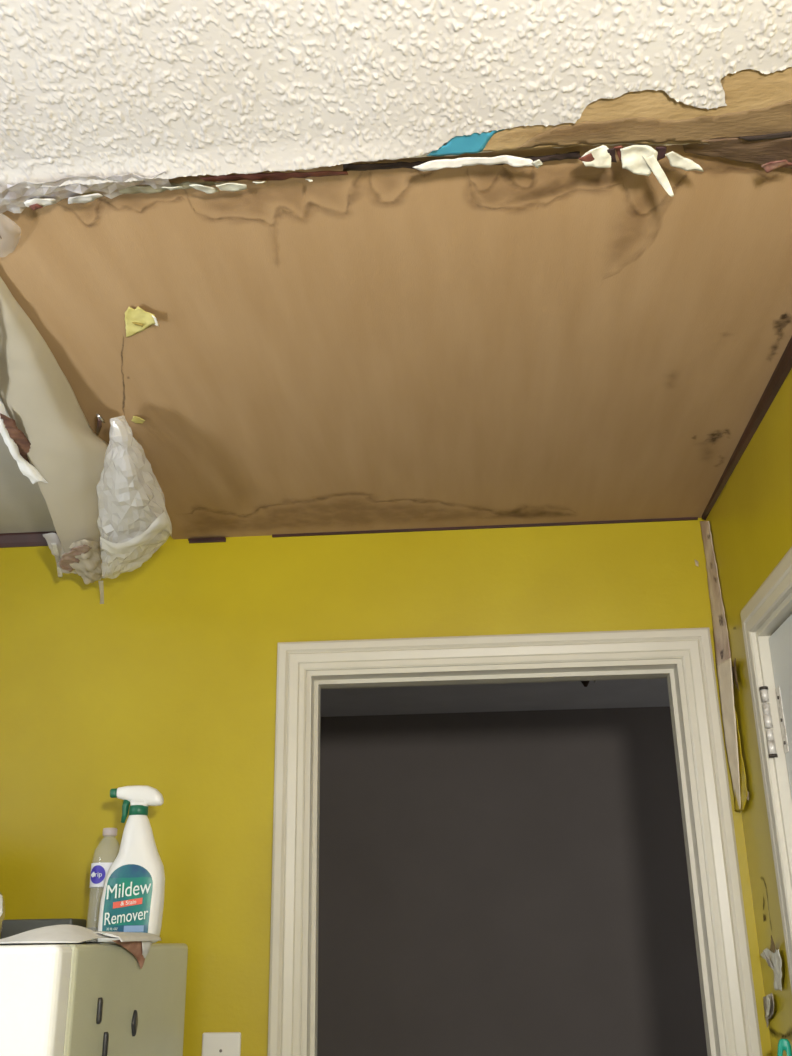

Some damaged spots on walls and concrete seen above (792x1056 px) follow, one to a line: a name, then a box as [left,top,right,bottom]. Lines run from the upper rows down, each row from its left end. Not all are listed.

peeling [427,67,792,169]
peeling [24,193,103,207]
peeling [760,935,785,1027]